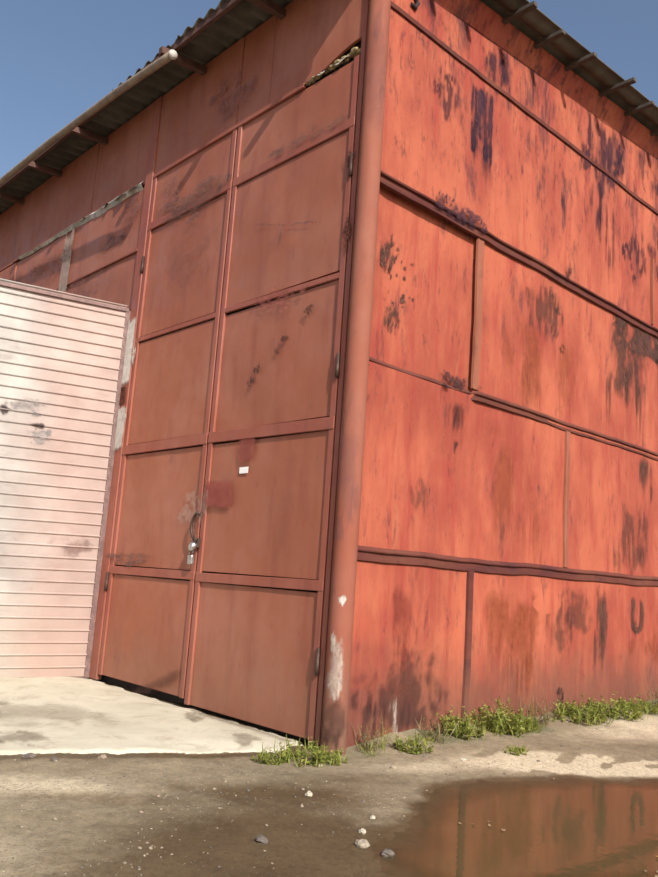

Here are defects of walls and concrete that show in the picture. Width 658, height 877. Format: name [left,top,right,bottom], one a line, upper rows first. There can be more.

spalling [296,40,362,95]
peeling [18,181,143,292]
peeling [122,319,136,384]
peeling [114,407,127,450]
peeling [328,633,343,700]